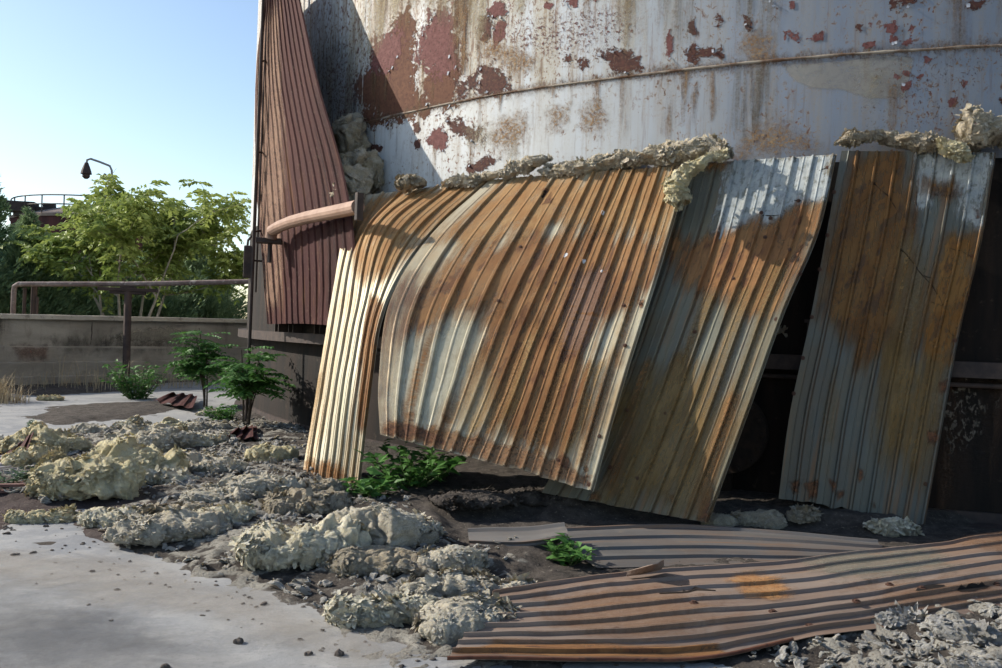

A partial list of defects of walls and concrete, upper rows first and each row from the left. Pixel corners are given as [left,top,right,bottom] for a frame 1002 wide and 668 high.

peeling [664,17,725,66]
peeling [743,15,753,32]
peeling [784,28,825,43]
peeling [883,0,917,46]
peeling [352,0,645,175]
peeling [876,56,978,115]
rust [257,1,285,311]
rust [817,150,958,368]
rust [916,232,979,372]
rust [351,166,821,514]
rust [731,574,787,600]
rust [455,643,725,657]